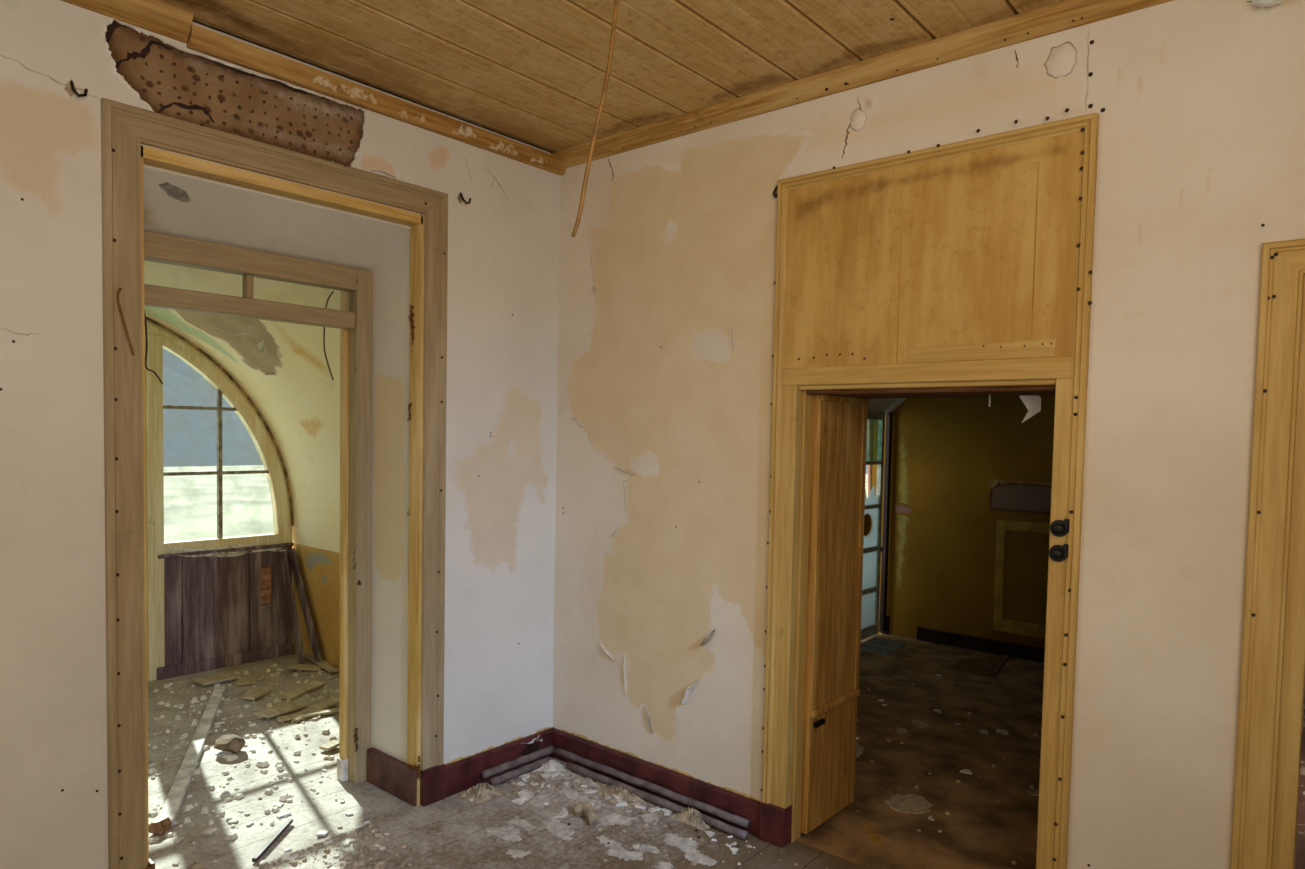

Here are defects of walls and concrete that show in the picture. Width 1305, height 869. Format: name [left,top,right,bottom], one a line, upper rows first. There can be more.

peeling [452,124,476,138]
spalling [176,310,288,378]
peeling [451,380,550,581]
peeling [564,27,1100,747]